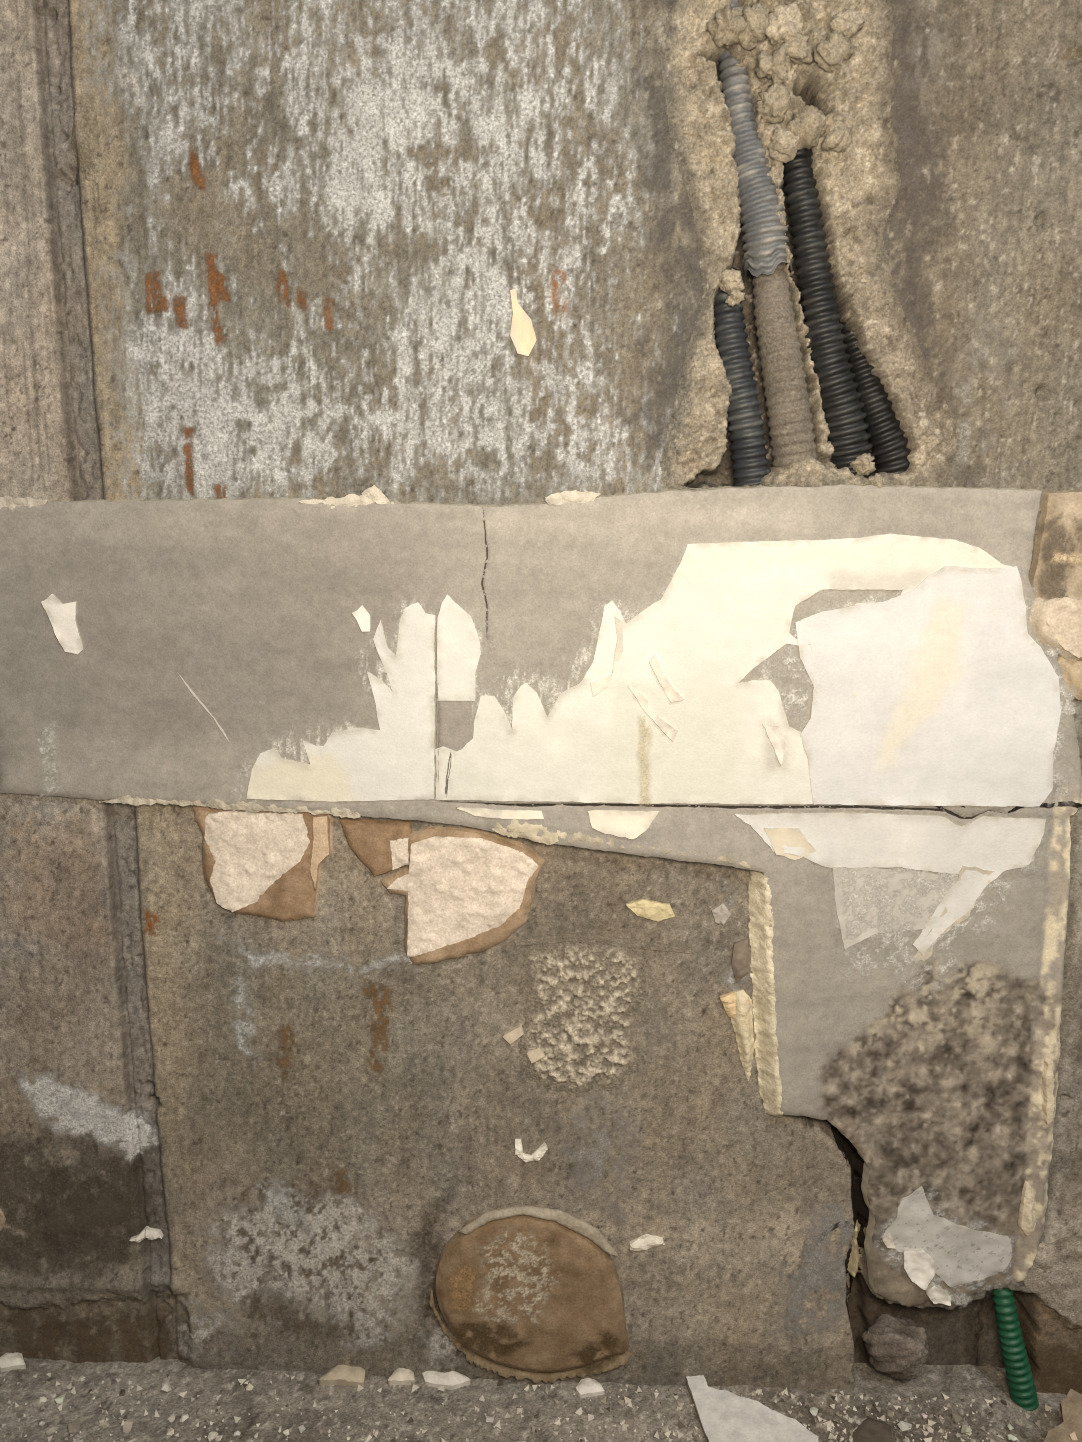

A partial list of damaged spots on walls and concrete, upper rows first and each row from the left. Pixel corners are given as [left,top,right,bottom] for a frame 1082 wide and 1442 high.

corrosion [190,152,205,188]
corrosion [145,272,189,328]
corrosion [207,254,230,344]
corrosion [278,269,306,309]
water stain [86,0,703,500]
corrosion [551,270,566,312]
spalling [659,0,964,490]
corrosion [183,428,193,495]
crack [480,511,488,634]
peeling [99,534,1076,1117]
water stain [0,1074,159,1278]
crack [817,1120,869,1329]